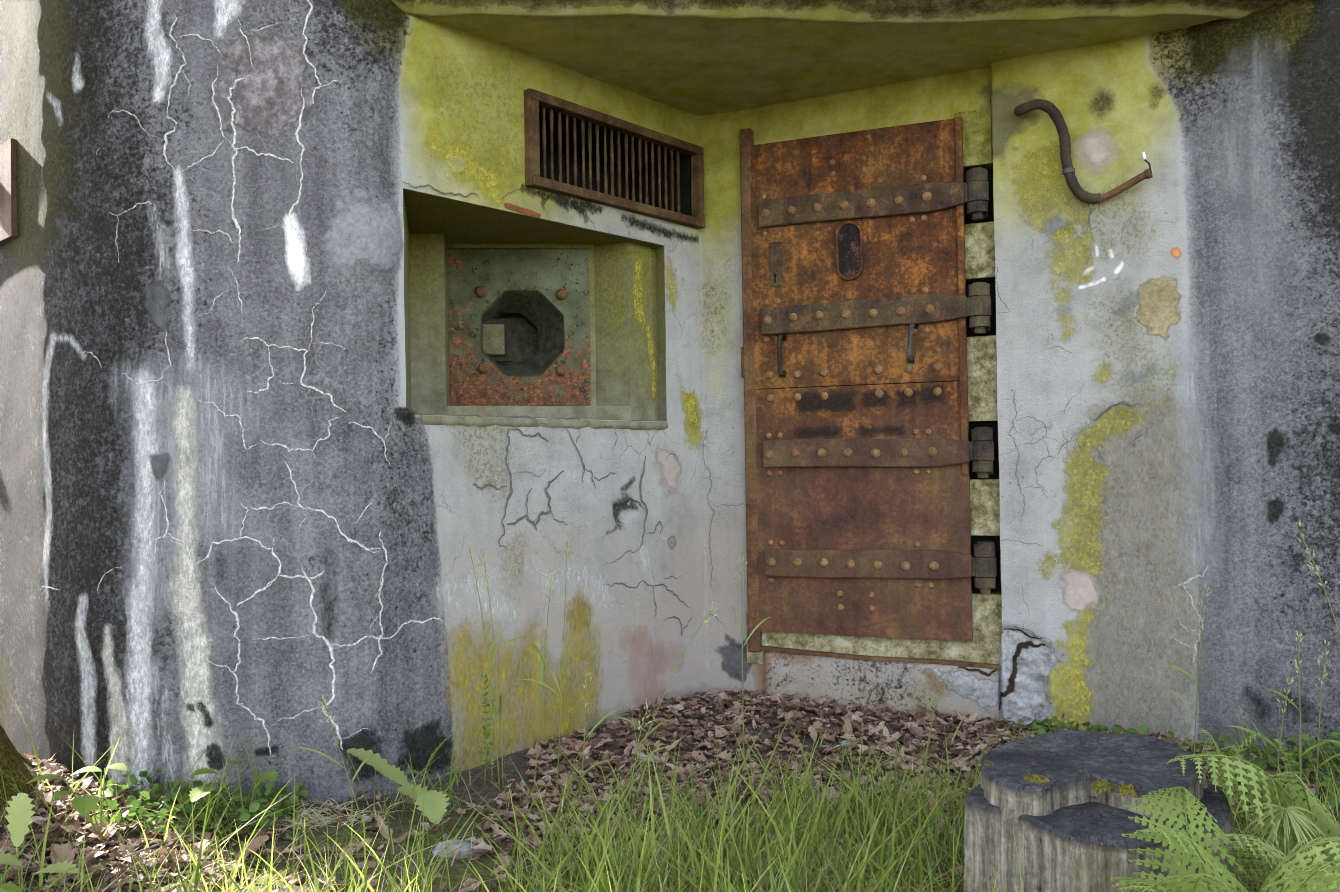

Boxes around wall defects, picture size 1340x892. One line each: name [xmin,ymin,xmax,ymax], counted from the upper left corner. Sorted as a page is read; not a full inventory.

leakage [73,60,83,90]
efflorescence [146,0,170,101]
efflorescence [215,0,241,36]
efflorescence [284,214,307,285]
crack [82,0,442,754]
leakage [43,335,85,601]
leakage [75,170,241,792]
crack [464,414,740,636]
crack [1001,384,1143,545]
leakage [1265,427,1284,466]
leakage [1268,497,1284,523]
crack [958,589,1046,710]